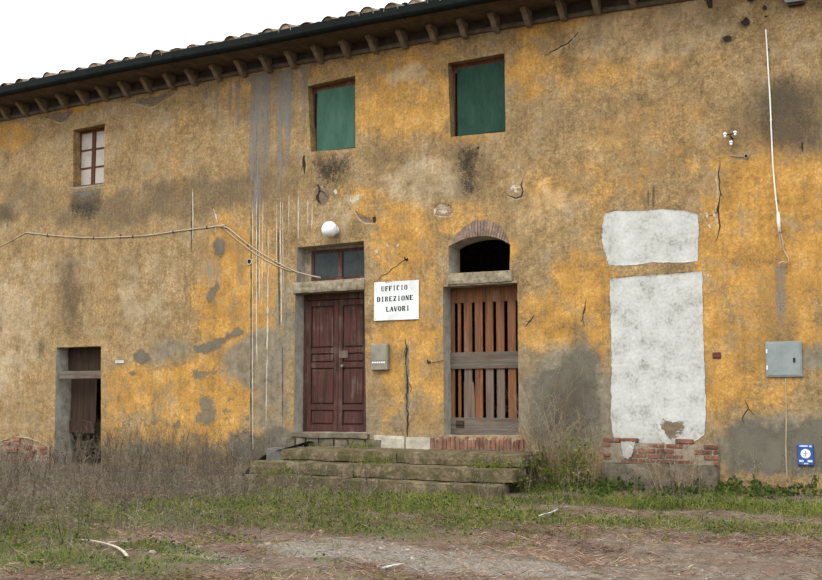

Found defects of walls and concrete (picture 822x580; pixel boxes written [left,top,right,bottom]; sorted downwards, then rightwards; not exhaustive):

crack [544,32,578,56]
flaking render [354,211,376,225]
flaking render [433,204,455,218]
crack [709,164,724,242]
peeling [212,237,225,258]
damp [230,69,313,463]
peeling [207,284,219,302]
peeling [194,327,244,353]
peeling [133,350,151,365]
peeling [192,363,250,380]
crack [404,340,412,437]
peeling [181,395,234,426]